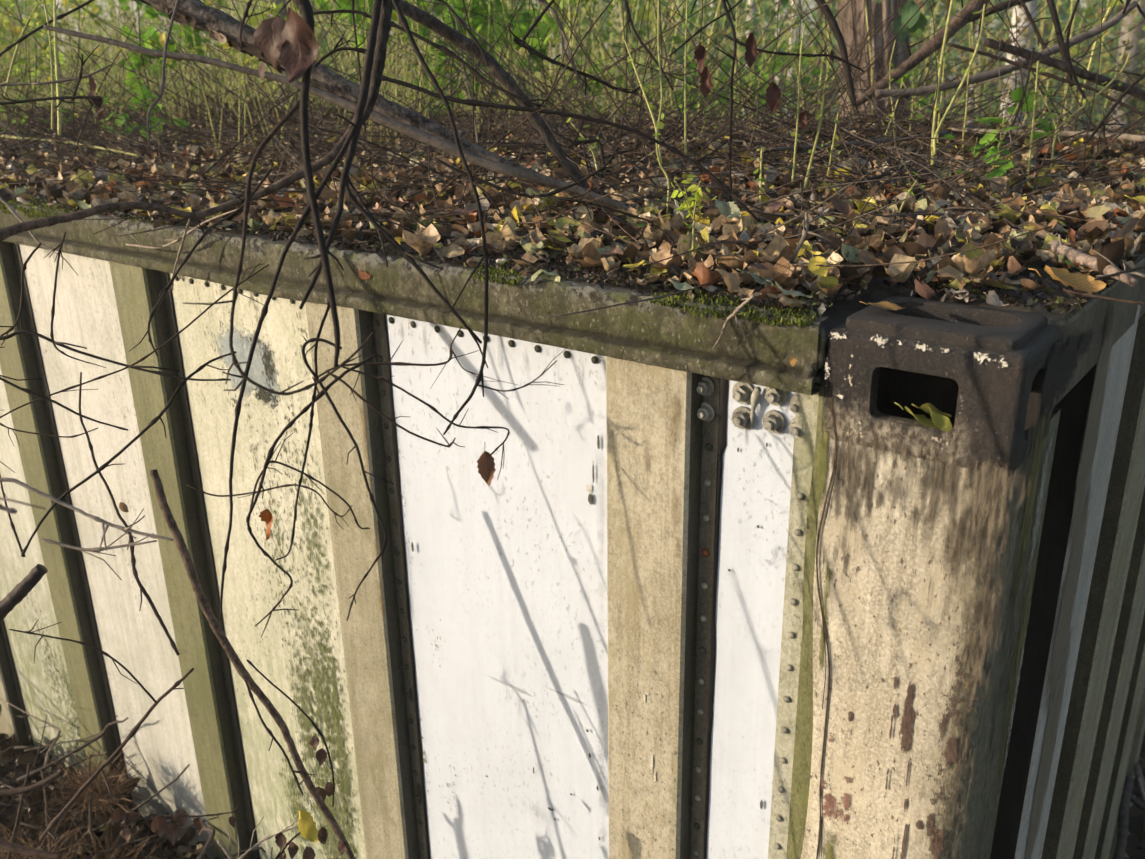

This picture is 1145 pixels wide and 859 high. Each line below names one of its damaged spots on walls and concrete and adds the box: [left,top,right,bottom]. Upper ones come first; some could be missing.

water stain [245,396,357,859]
corrosion [821,776,852,824]
water stain [830,301,1115,792]